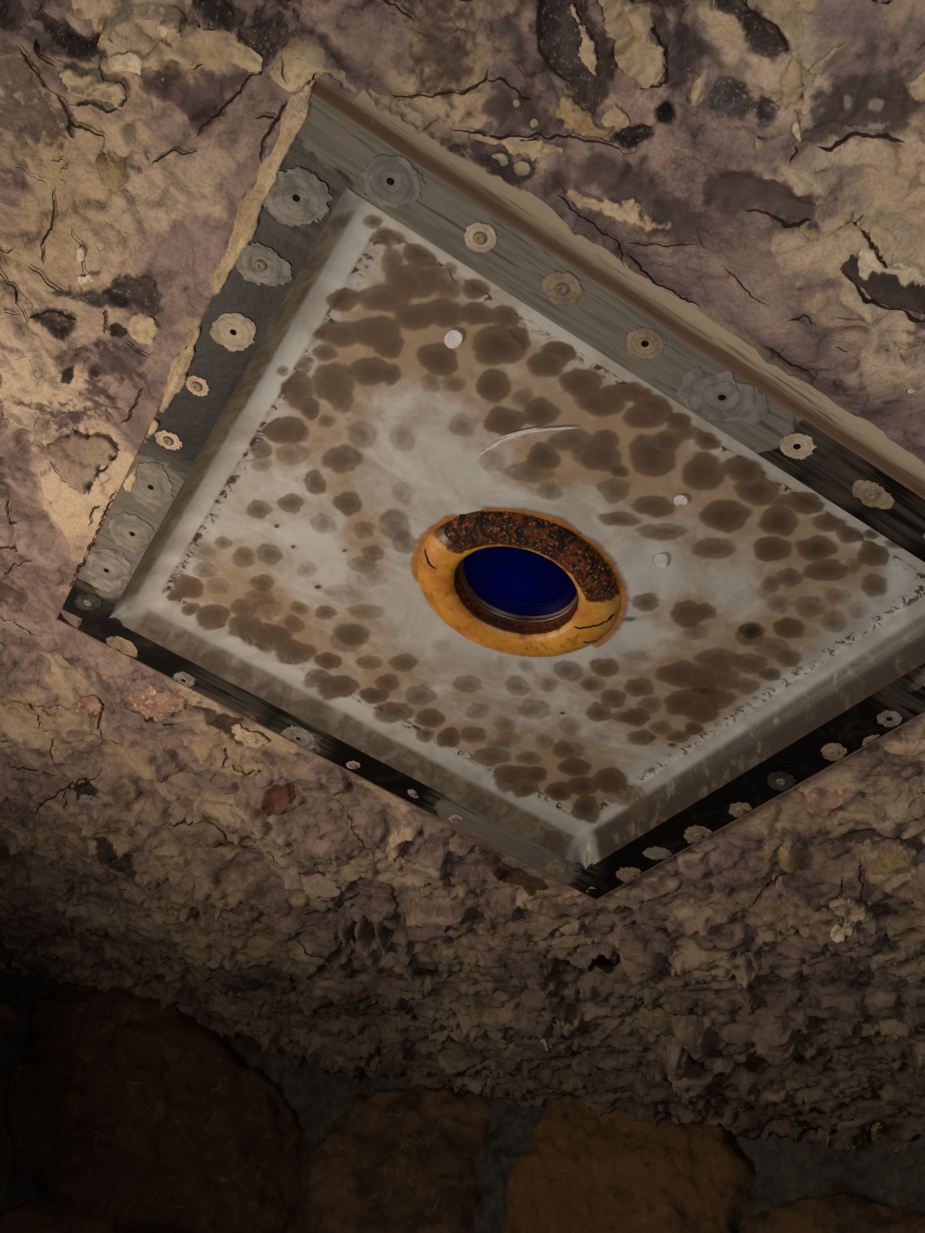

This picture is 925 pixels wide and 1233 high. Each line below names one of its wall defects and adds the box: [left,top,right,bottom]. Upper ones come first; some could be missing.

crack [0,39,150,358]
crack [152,56,316,165]
peeling [470,119,565,175]
crack [449,127,635,155]
flaking render [529,0,686,156]
crack [789,132,905,163]
crack [852,221,887,269]
crack [844,272,925,323]
peeling [857,215,925,286]
water stain [250,216,901,747]
corrosion [411,508,628,648]
water stain [167,540,643,823]